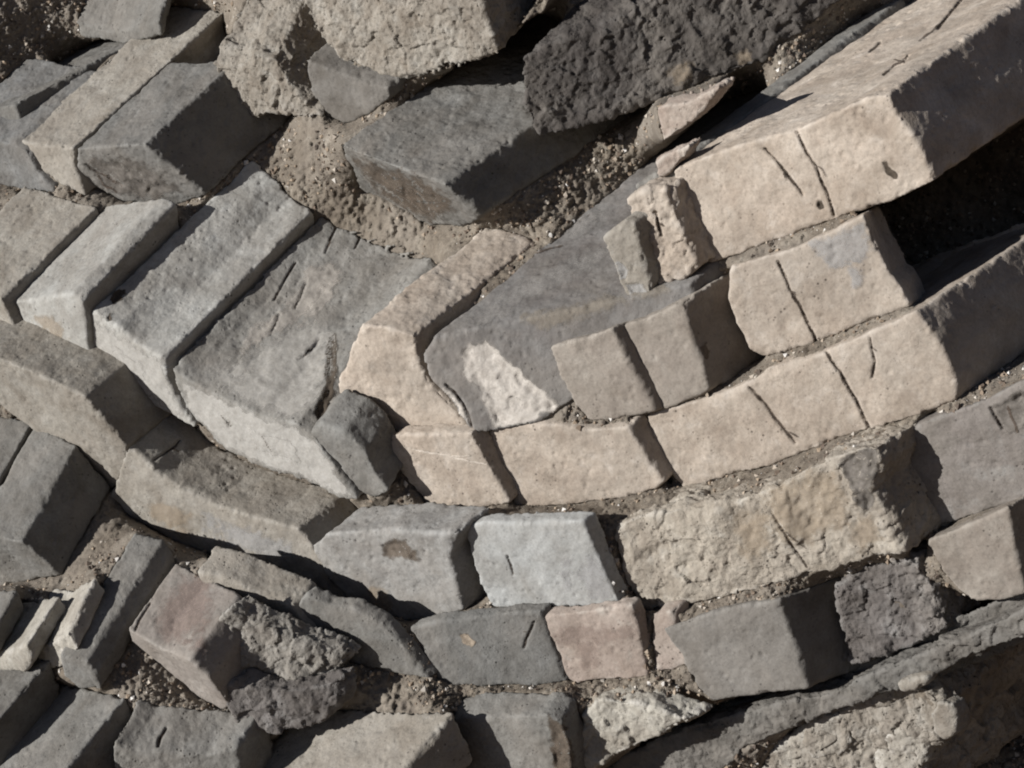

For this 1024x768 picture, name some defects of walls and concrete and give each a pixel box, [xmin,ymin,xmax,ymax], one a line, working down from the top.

crack [764,132,835,216]
crack [777,262,876,428]
crack [750,388,798,443]